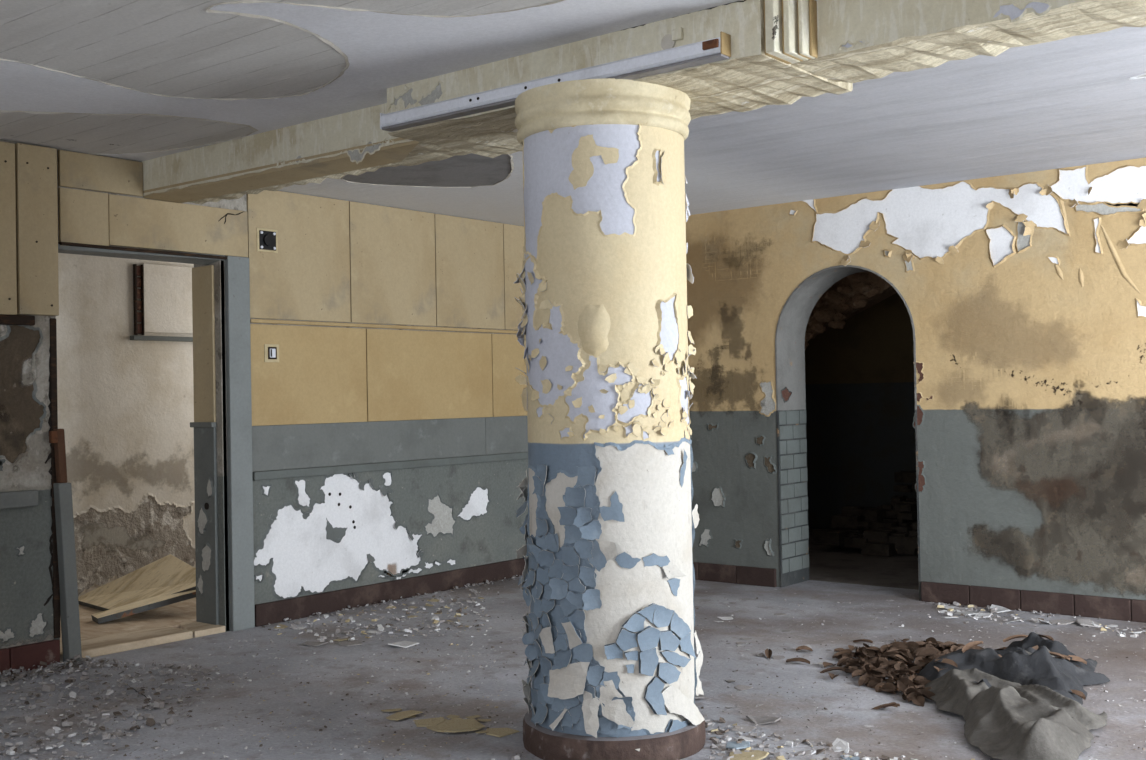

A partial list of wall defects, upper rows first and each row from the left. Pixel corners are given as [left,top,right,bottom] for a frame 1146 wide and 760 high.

spalling [991,0,1052,23]
spalling [340,138,395,164]
peeling [789,164,1146,350]
spalling [0,325,47,467]
peeling [254,471,491,600]
peeling [514,124,726,738]
water stain [962,370,1146,595]
peeling [0,611,48,644]
peeling [386,710,485,733]